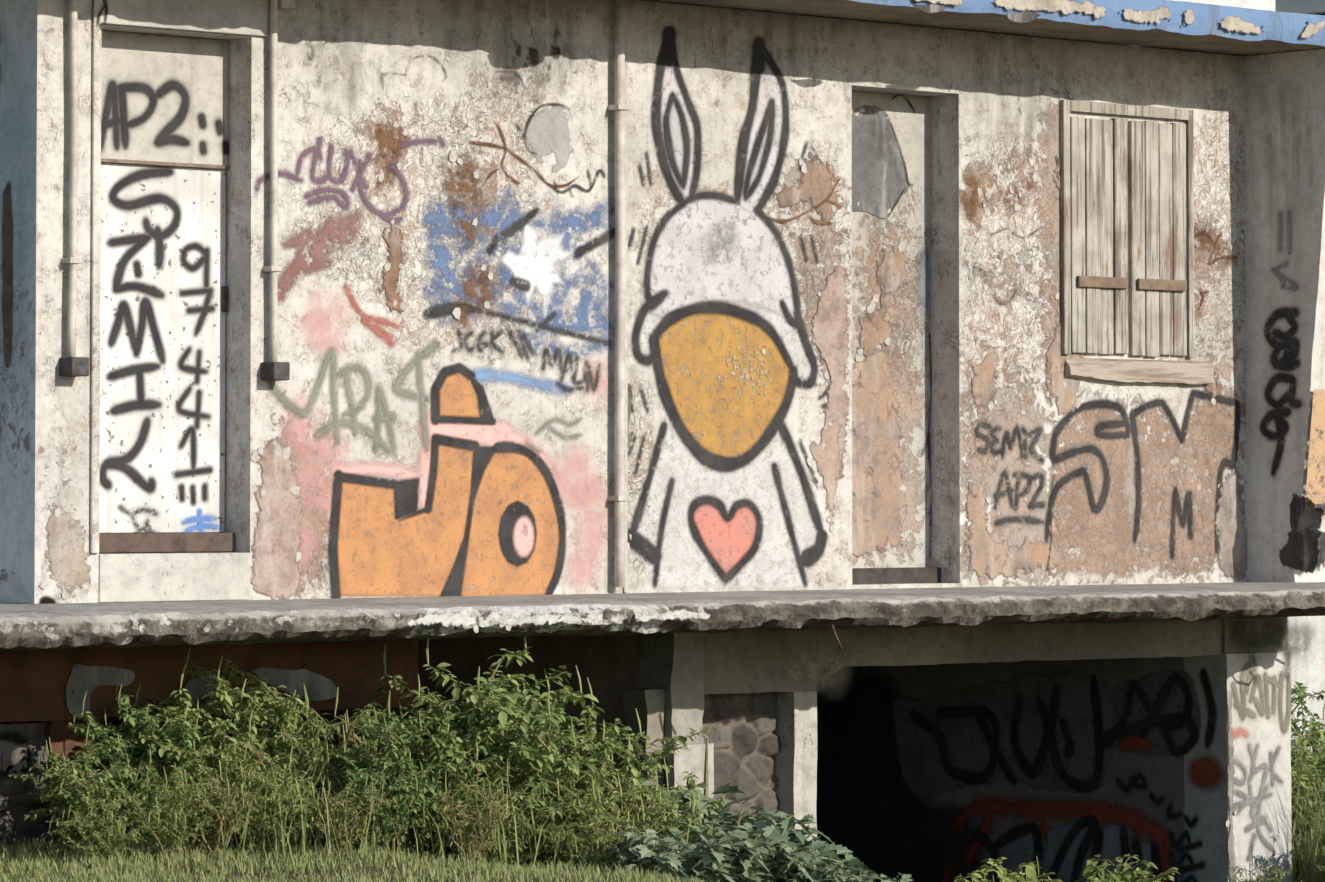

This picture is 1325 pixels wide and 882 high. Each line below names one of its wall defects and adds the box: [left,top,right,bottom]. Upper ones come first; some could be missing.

spalling [914,0,962,13]
peeling [993,0,1195,26]
peeling [1220,15,1265,34]
peeling [1301,20,1325,38]
spalling [770,102,909,225]
peeling [1044,292,1085,415]
peeling [970,352,1002,415]
peeling [1204,372,1224,406]
peeling [964,482,1062,581]
peeling [408,611,479,633]
peeling [495,613,607,631]
peeling [635,605,710,622]